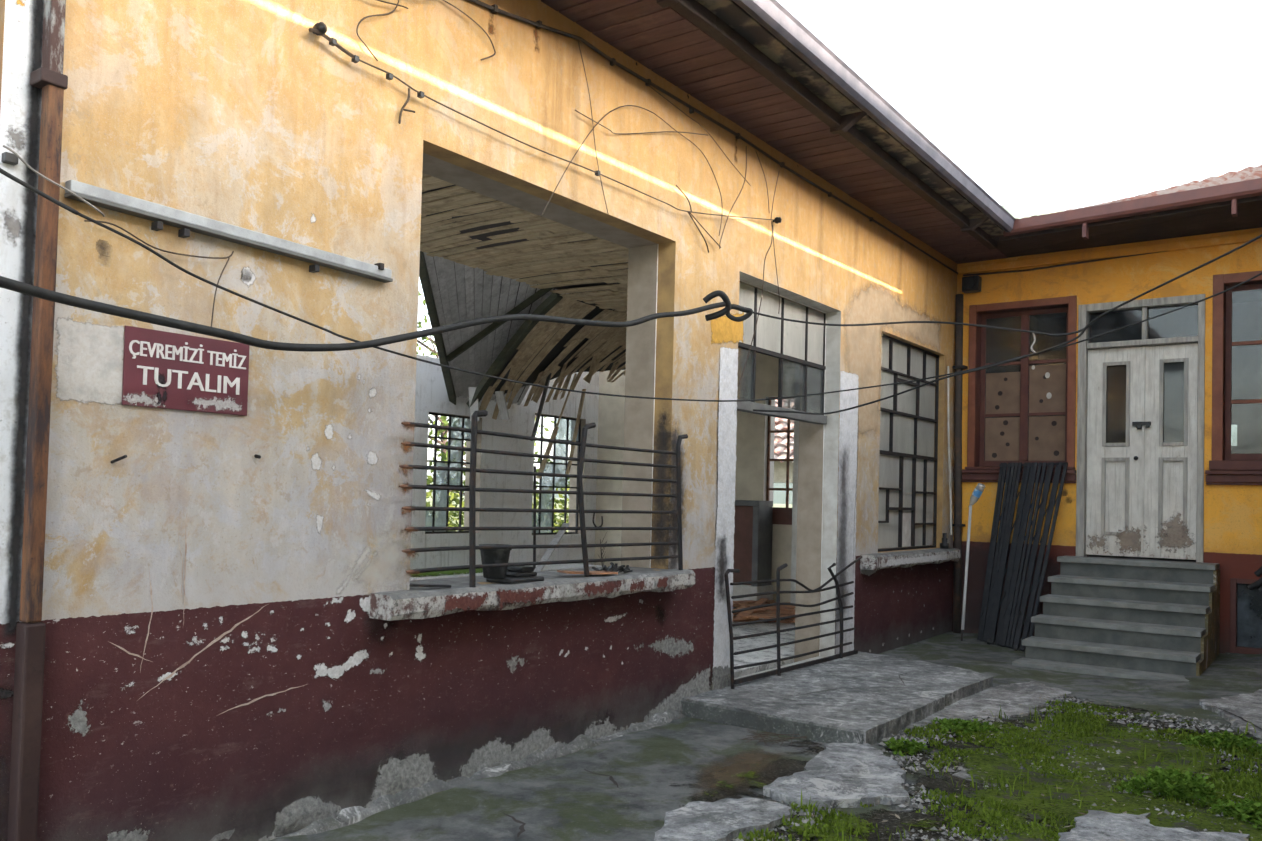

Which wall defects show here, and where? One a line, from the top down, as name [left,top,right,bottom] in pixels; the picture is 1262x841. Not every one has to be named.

peeling [1087,511,1196,555]
peeling [316,596,370,639]
peeling [442,585,546,616]
peeling [582,576,670,621]
peeling [313,650,393,680]
flaking render [584,665,731,740]
flaking render [364,727,568,809]